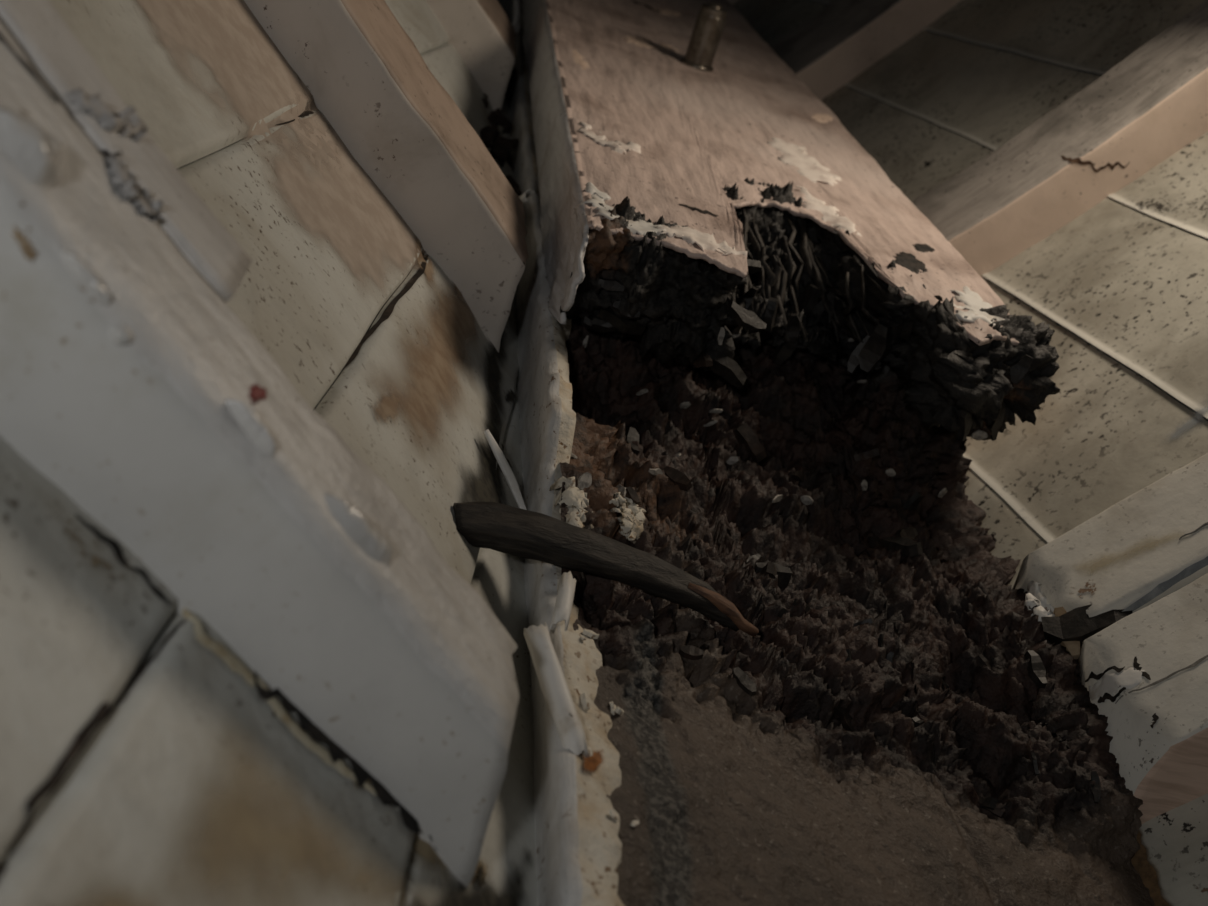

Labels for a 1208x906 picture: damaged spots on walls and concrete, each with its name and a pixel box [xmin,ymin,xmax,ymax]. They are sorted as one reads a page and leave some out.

crack [1062,155,1130,173]
crack [341,255,428,371]
spalling [524,137,1155,906]
crack [0,514,437,877]
crack [1115,655,1208,728]